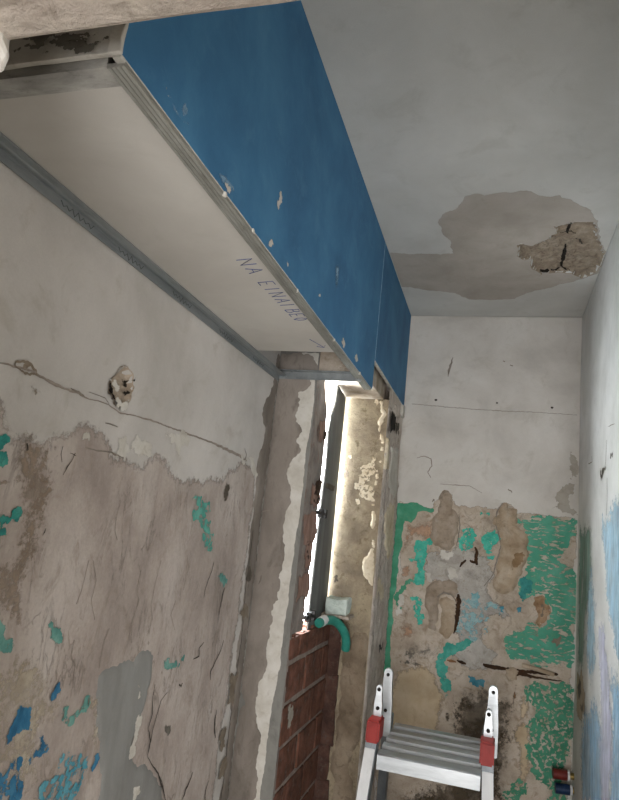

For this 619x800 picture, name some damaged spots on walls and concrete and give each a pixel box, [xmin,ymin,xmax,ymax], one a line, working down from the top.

peeling [390,191,606,300]
crack [61,447,124,475]
spalling [108,365,136,412]
crack [0,362,247,461]
flaking render [296,478,323,603]
flaking render [0,400,258,800]
flaking render [342,399,592,800]
crack [147,625,243,800]
water stain [409,765,482,800]
water stain [446,688,489,739]
water stain [494,702,512,800]
crack [517,672,561,681]